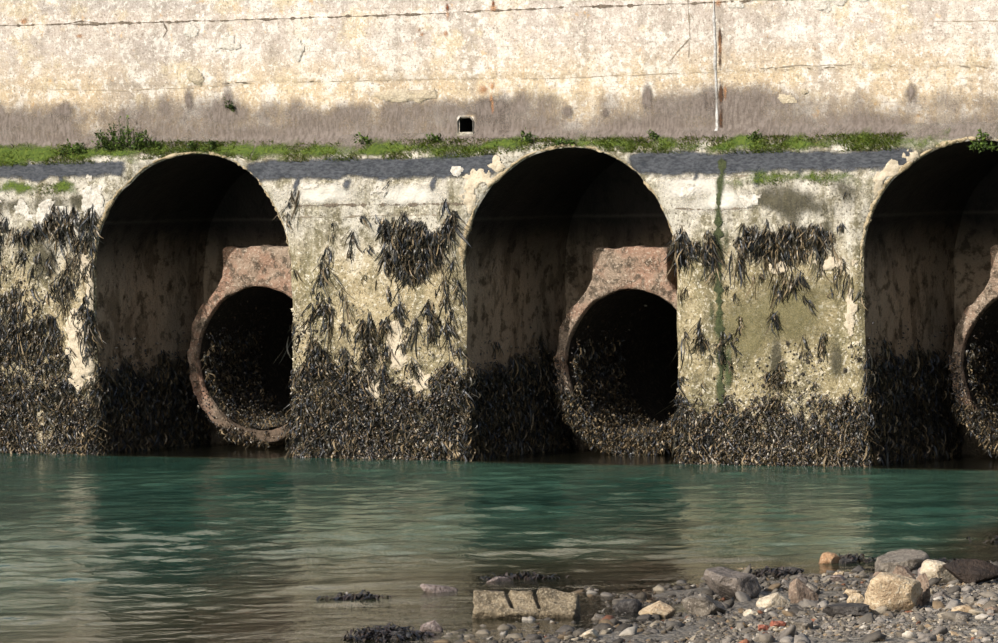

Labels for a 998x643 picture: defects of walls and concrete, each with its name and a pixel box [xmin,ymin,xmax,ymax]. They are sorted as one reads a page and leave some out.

leakage [0,85,998,252]
corrosion [718,85,726,127]